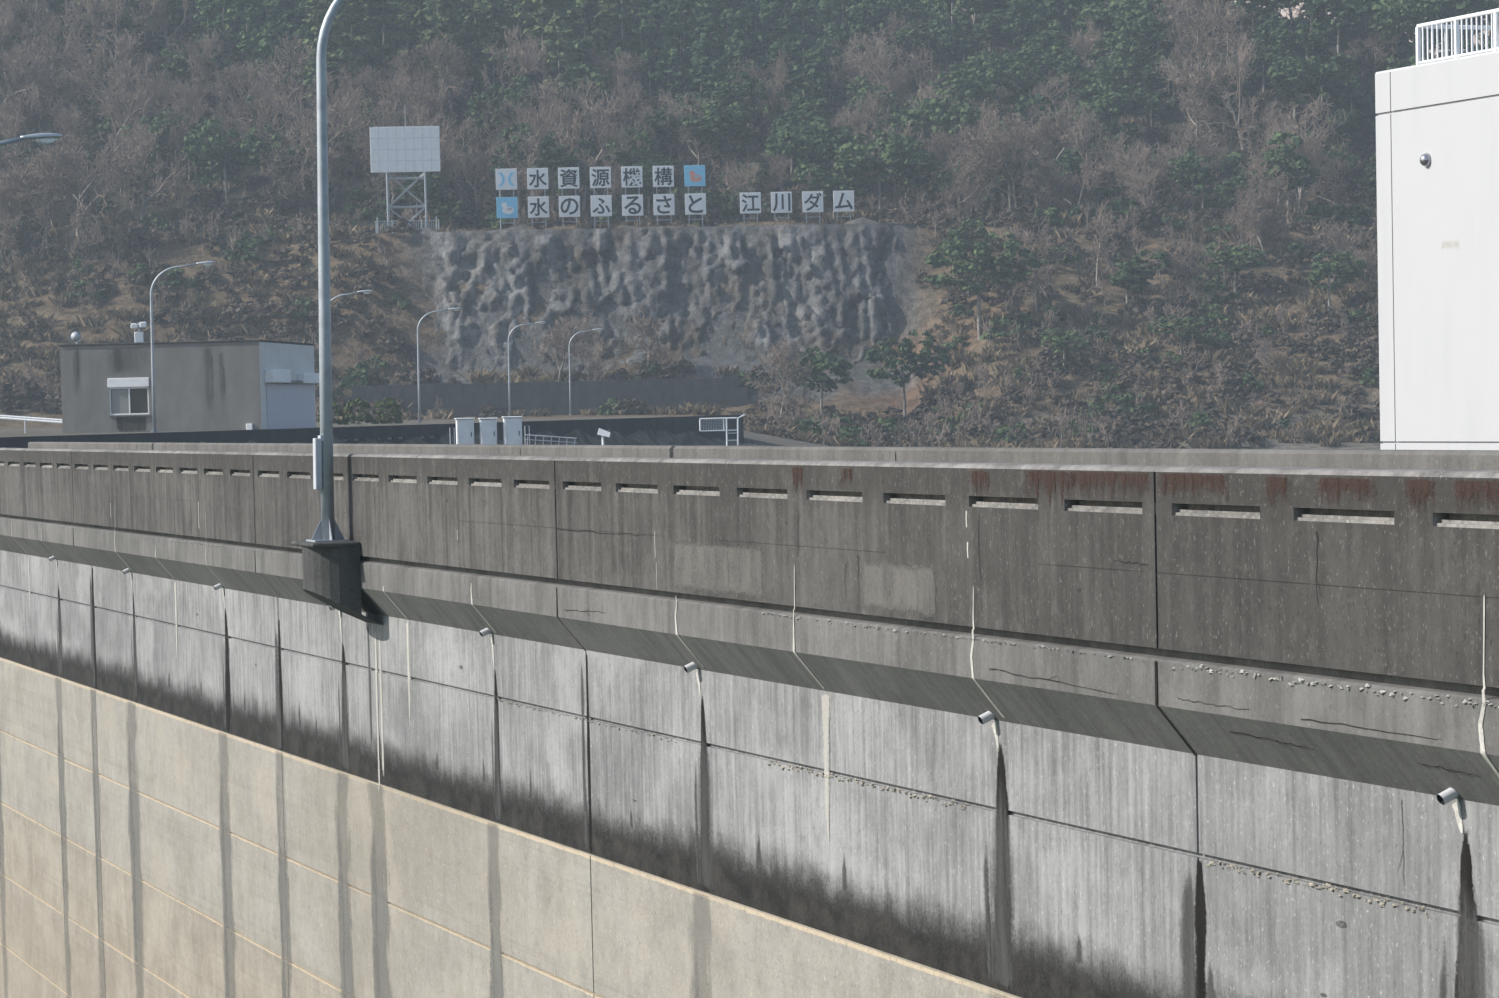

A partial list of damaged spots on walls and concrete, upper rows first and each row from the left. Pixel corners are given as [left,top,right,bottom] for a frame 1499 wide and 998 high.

corrosion [1026,470,1226,507]
corrosion [1317,477,1376,504]
corrosion [1404,479,1433,510]
corrosion [1454,480,1499,508]
water stain [1478,596,1499,777]
water stain [0,522,1214,998]
water stain [1439,801,1486,998]